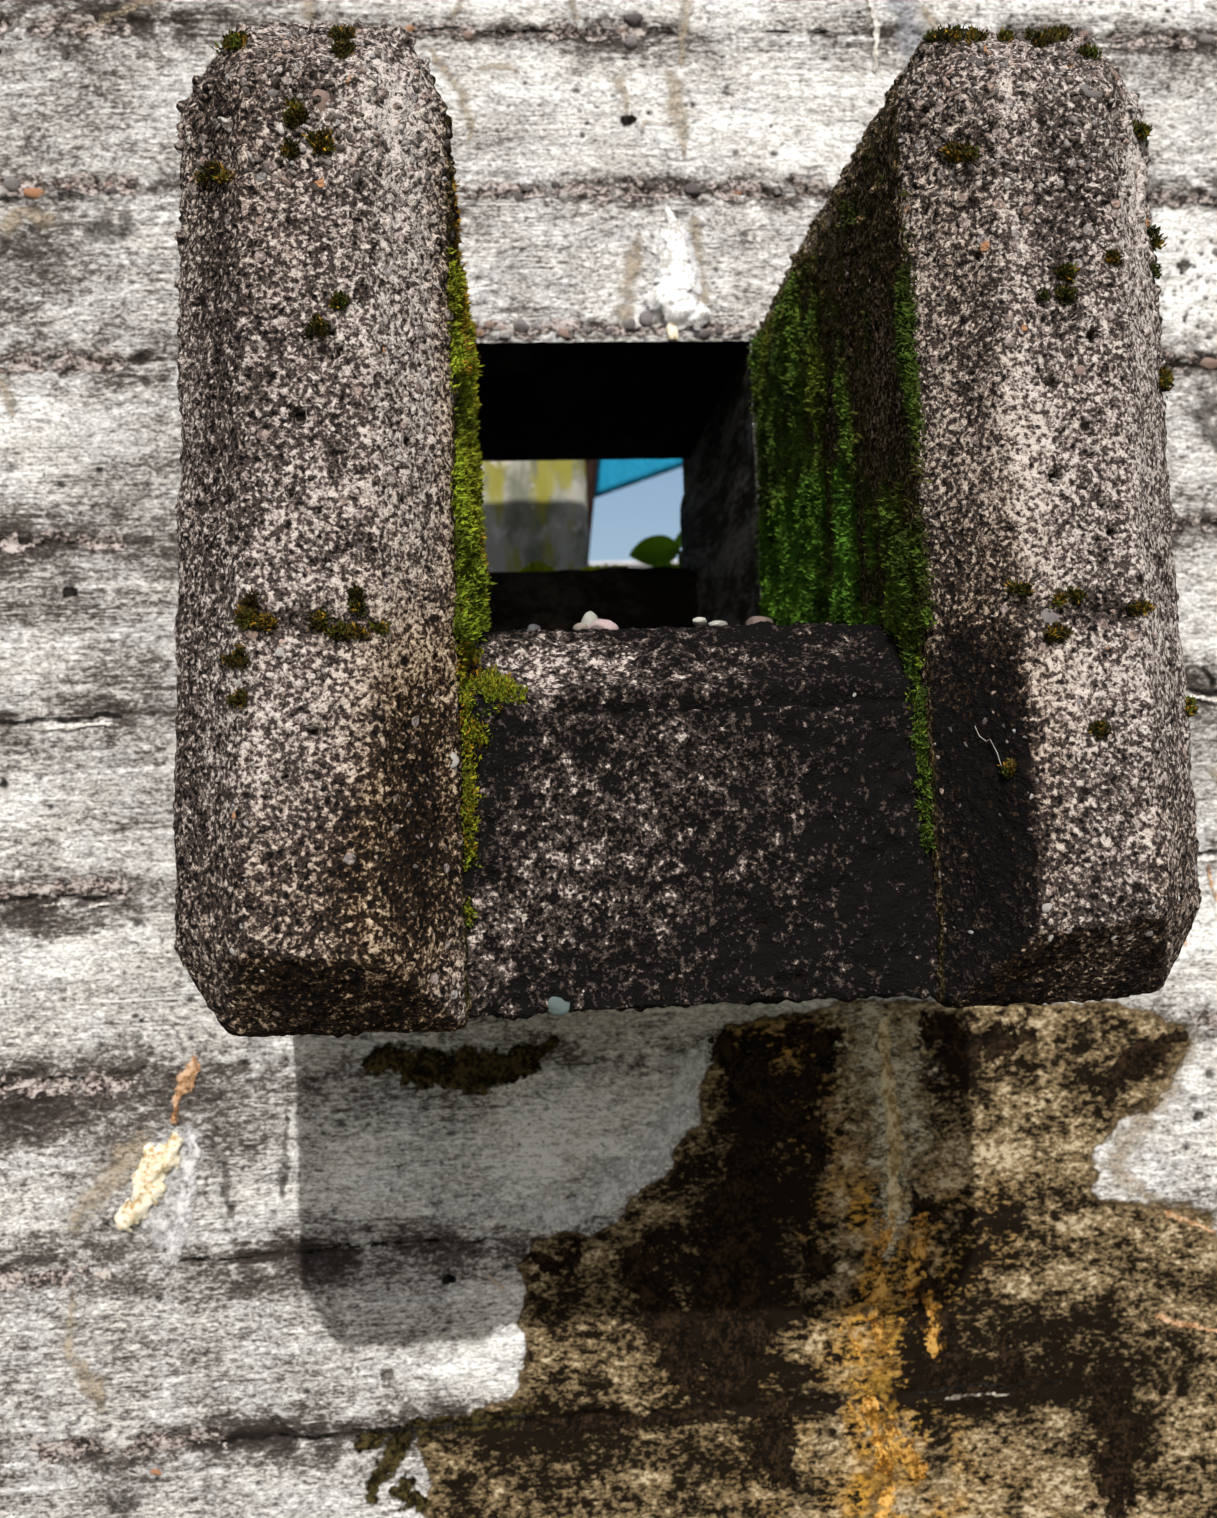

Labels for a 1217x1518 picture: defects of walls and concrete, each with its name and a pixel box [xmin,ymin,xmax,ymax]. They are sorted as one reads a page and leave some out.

leakage [616,207,711,340]
leakage [70,1054,235,1263]
leakage [354,998,1217,1518]
rust [838,1210,947,1364]
rust [846,1395,930,1518]